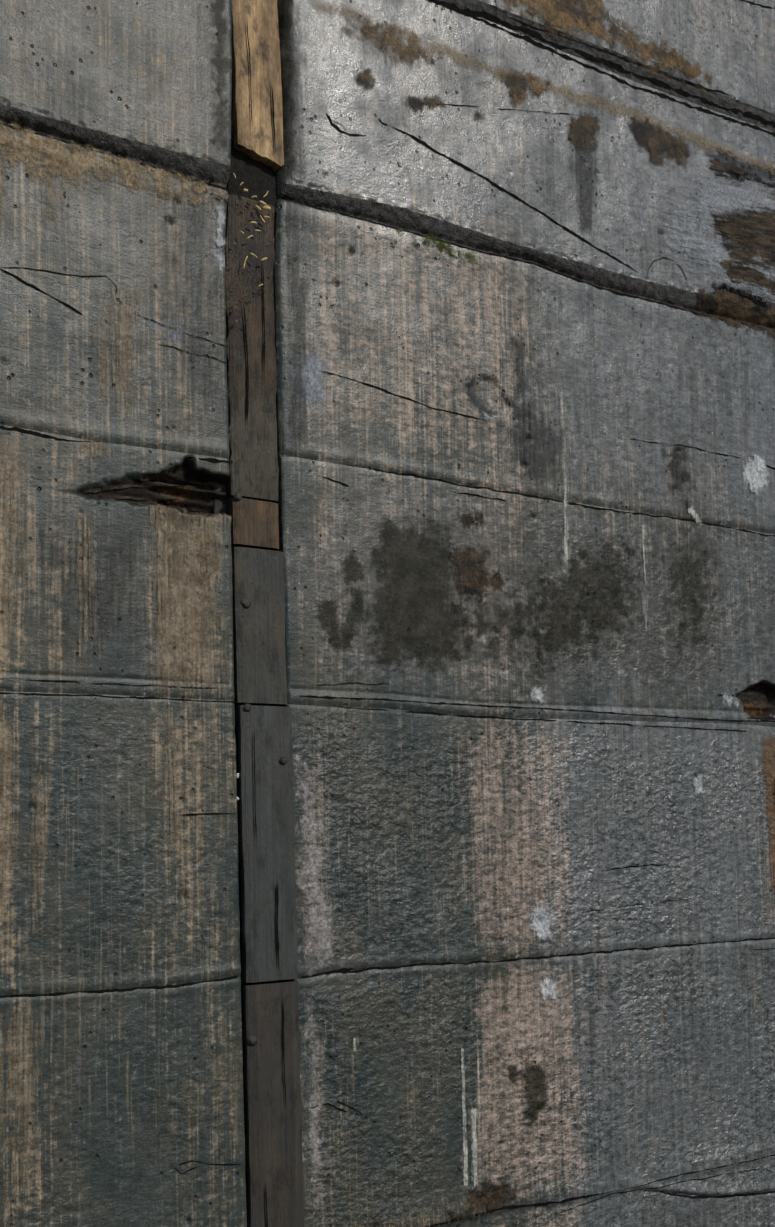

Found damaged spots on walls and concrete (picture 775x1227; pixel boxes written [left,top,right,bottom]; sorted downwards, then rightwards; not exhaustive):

water stain [0,123,228,401]
crack [289,100,760,328]
water stain [533,79,775,230]
water stain [651,180,775,334]
spalling [72,459,230,521]
water stain [318,398,647,702]
water stain [663,542,718,651]
spalling [718,683,775,722]
rust [763,737,775,888]
water stain [508,1065,547,1125]